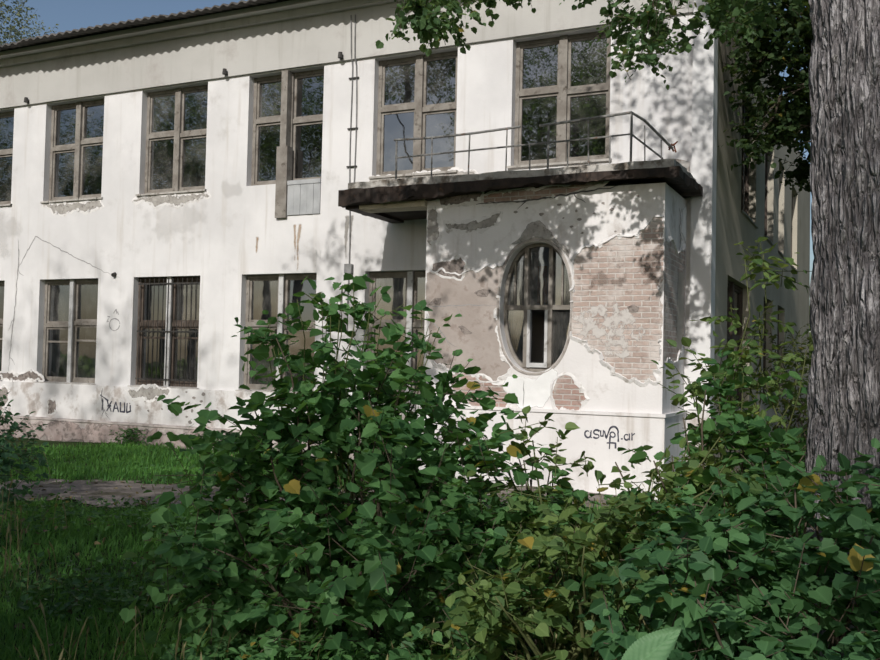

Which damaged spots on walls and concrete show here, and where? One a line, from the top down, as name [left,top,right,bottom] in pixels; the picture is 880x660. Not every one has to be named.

spalling [40,198,104,217]
spalling [131,190,211,209]
crack [8,236,120,371]
peeling [425,254,513,407]
flaking render [427,181,687,387]
spalling [0,368,45,411]
spalling [0,384,209,449]
flaking render [550,372,590,411]